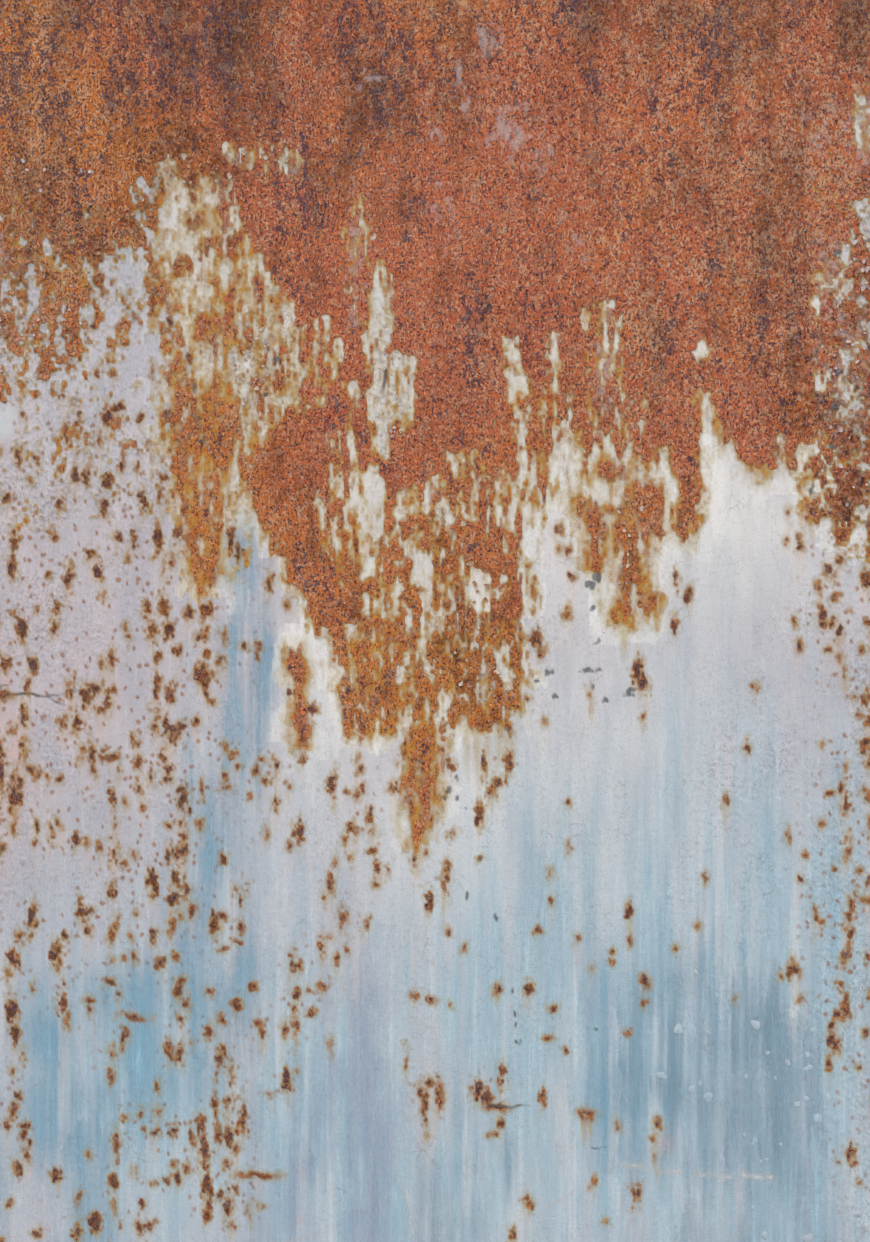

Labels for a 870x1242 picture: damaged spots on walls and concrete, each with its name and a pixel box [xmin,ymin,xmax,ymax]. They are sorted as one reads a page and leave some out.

peeling [6,132,105,192]
peeling [94,159,232,257]
peeling [833,226,870,291]
peeling [824,319,870,488]
corrosion [0,0,870,981]
peeling [455,581,490,629]
peeling [585,573,601,590]
corrosion [48,929,70,1029]
corrosion [4,1000,24,1056]
corrosion [825,981,852,1072]
corrosion [70,977,273,1242]
corrosion [469,1063,508,1137]